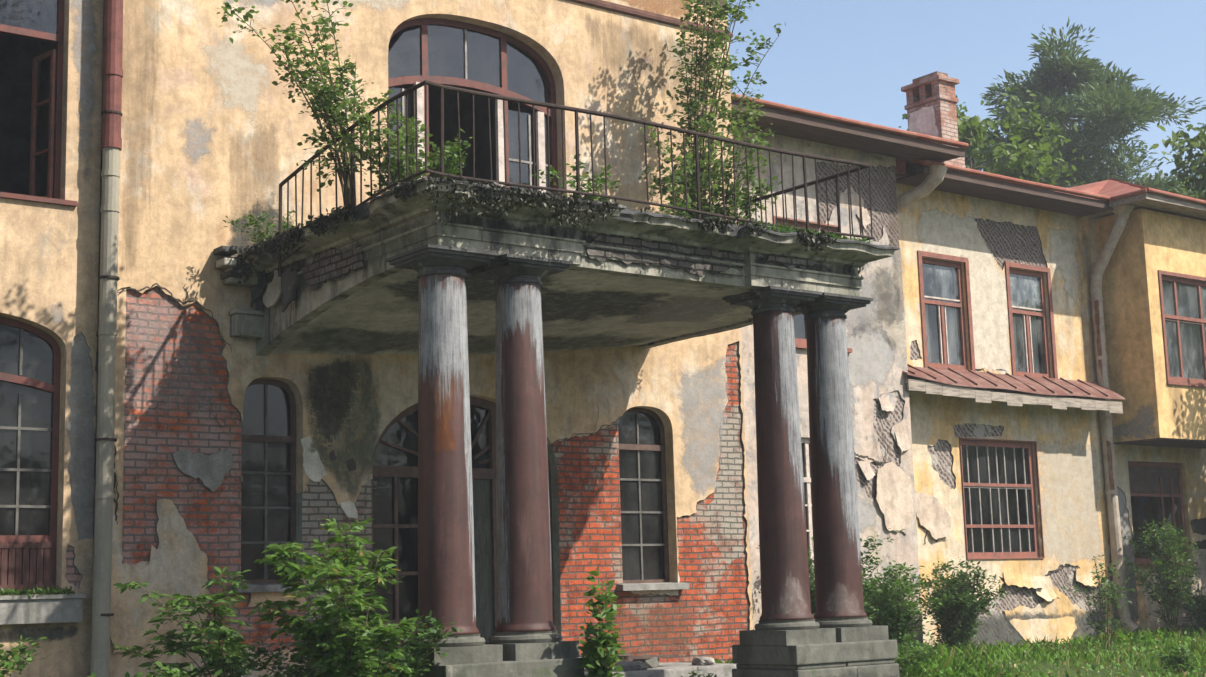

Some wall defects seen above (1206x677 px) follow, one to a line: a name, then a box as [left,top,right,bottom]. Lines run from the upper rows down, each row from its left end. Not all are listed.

flaking render [122,286,372,672]
water stain [292,328,419,438]
peeling [418,274,476,618]
water stain [467,335,495,353]
water stain [543,336,655,350]
flaking render [495,283,749,665]
peeling [772,311,805,513]
peeling [814,317,904,560]
crack [854,438,900,475]
flaking render [927,423,1003,489]
peeling [917,208,1081,374]
flaking render [971,487,1138,648]